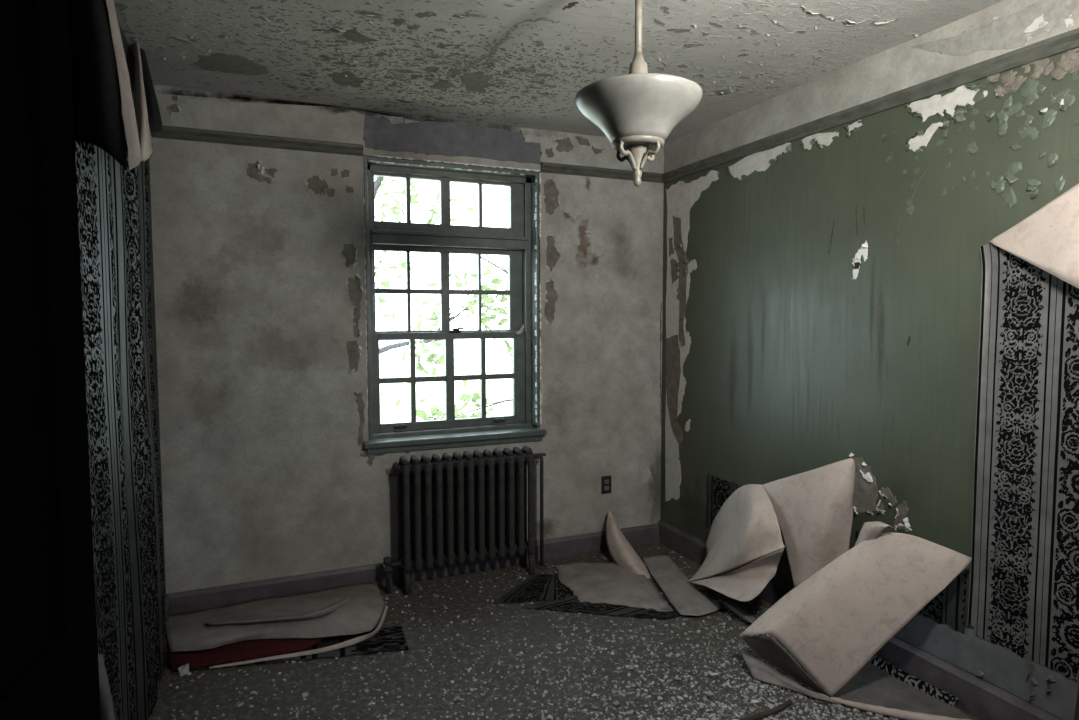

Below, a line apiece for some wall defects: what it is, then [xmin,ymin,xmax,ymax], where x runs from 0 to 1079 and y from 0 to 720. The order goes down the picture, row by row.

peeling [341,228,409,467]
peeling [114,0,905,425]
peeling [665,120,862,502]
peeling [905,83,1003,155]
peeling [1038,99,1067,115]
flaking render [849,453,912,532]